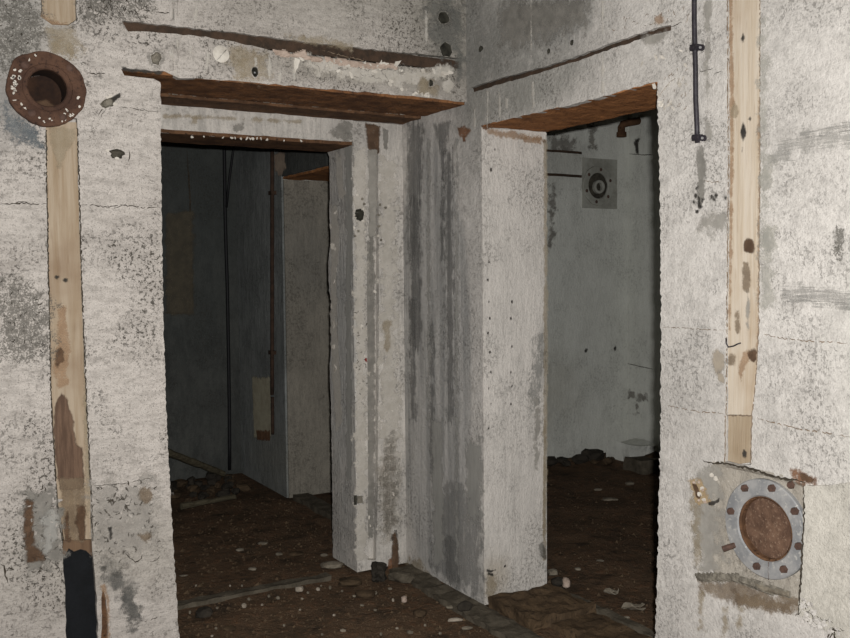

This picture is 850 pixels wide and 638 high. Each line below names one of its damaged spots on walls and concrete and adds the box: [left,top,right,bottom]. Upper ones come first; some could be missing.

peeling [273,42,455,97]
water stain [407,121,485,596]
peeling [19,394,84,589]
corrosion [388,533,399,569]
corrosion [739,496,792,562]